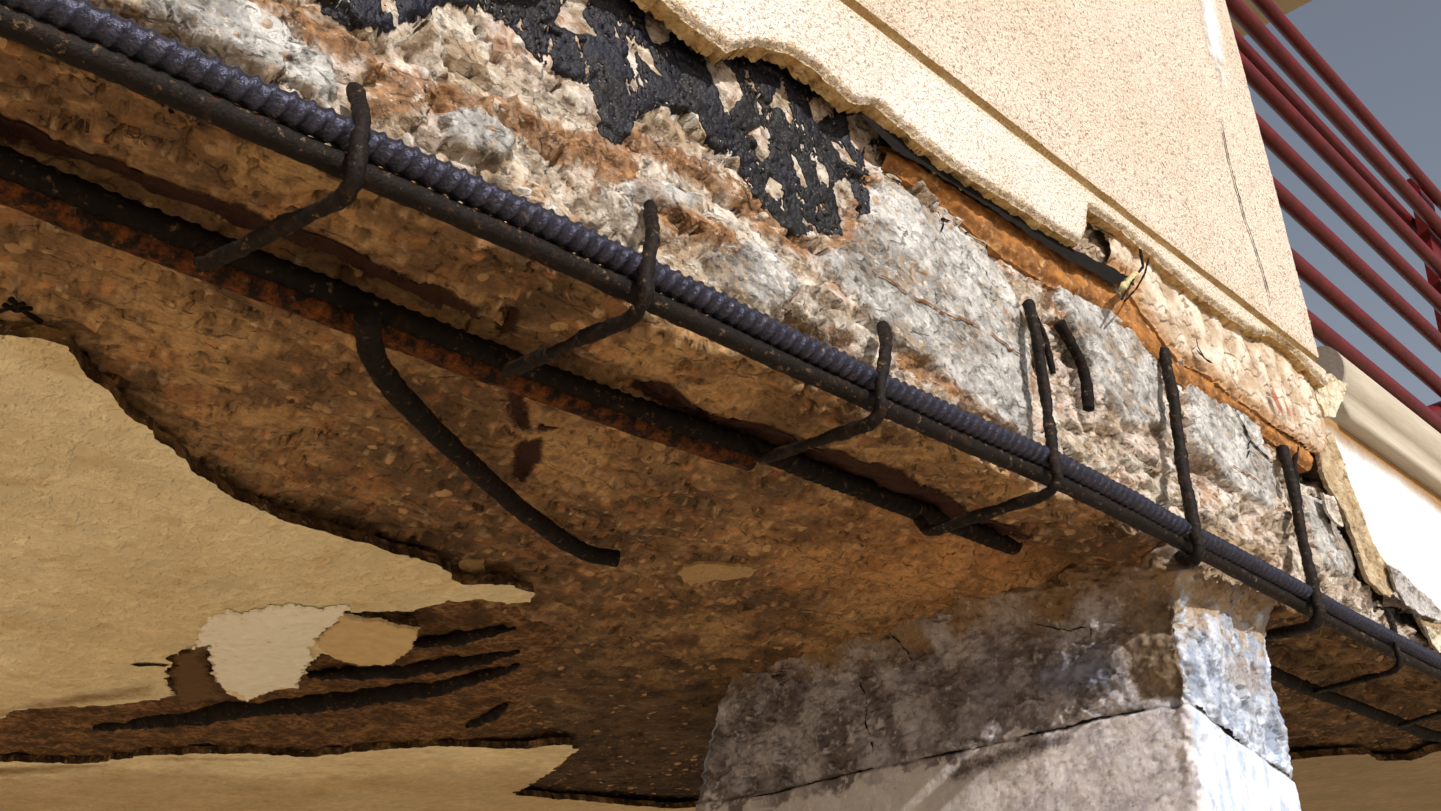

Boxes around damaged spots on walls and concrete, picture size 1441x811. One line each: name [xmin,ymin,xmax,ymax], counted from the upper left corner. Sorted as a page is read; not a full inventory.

corrosion [0,116,270,230]
crack [1218,109,1271,307]
corrosion [281,229,519,337]
corrosion [507,391,558,483]
spalling [0,37,1162,803]
corrosion [629,380,1033,540]
crack [750,682,873,798]
crack [920,745,987,759]
crack [1021,708,1154,737]
crack [1196,705,1295,782]
spalling [1265,601,1441,754]